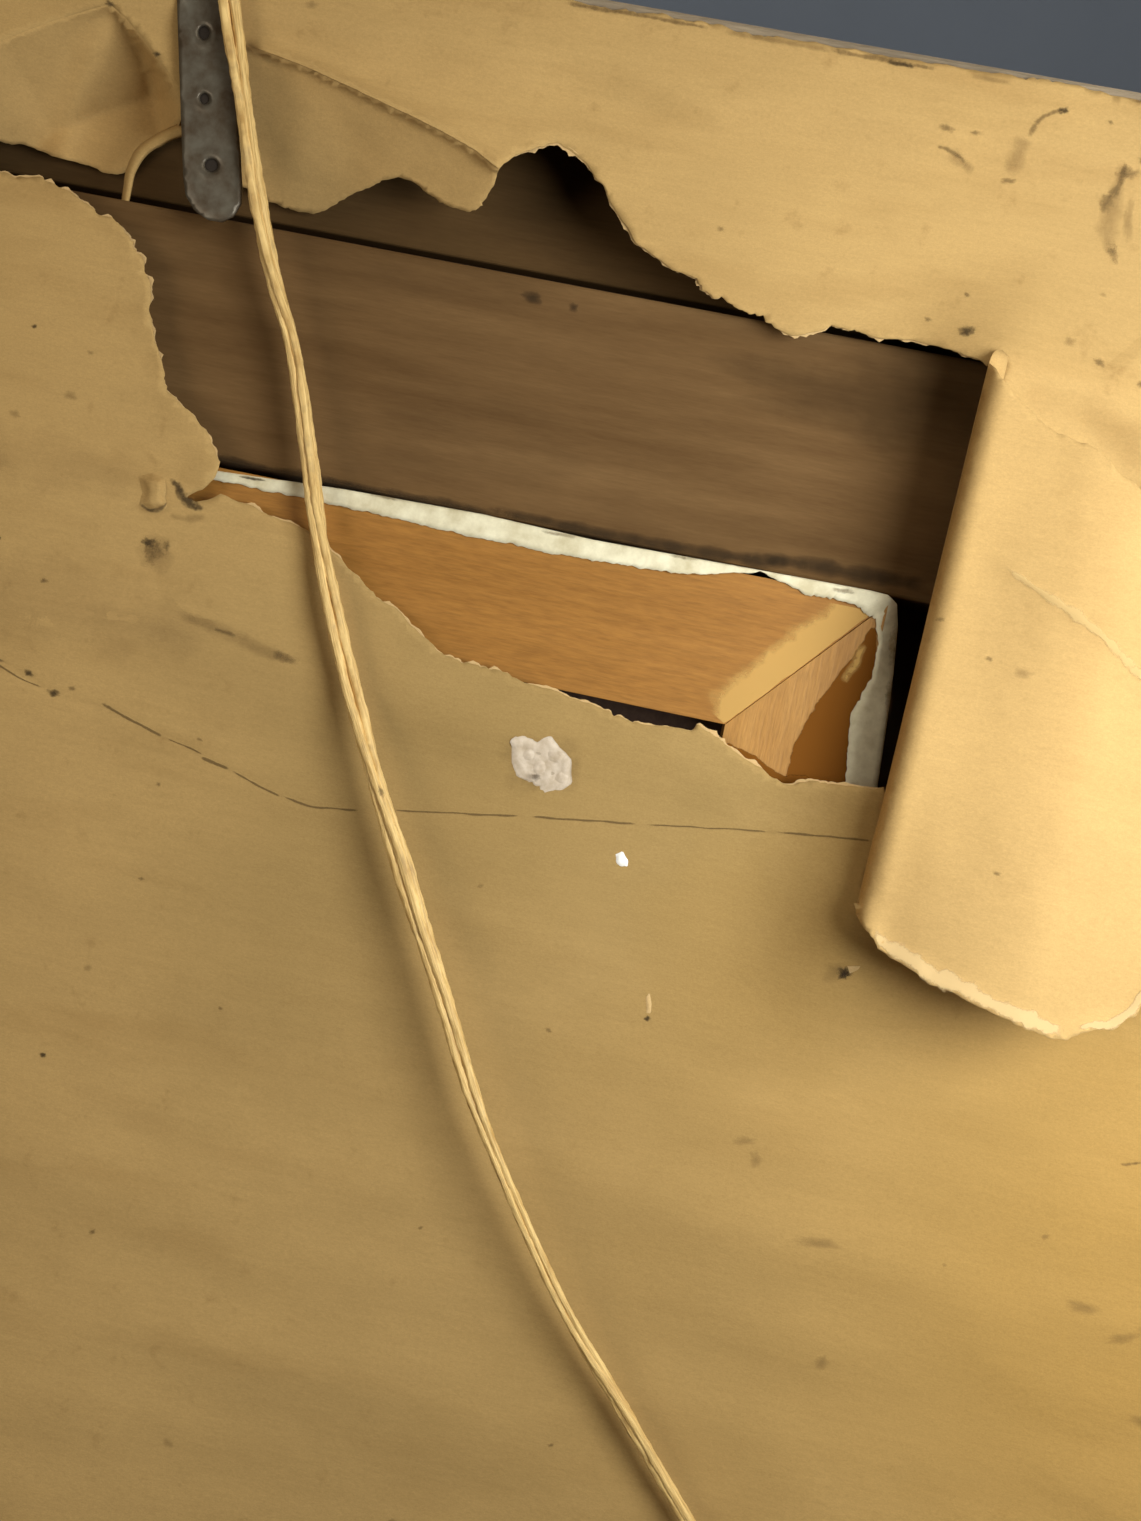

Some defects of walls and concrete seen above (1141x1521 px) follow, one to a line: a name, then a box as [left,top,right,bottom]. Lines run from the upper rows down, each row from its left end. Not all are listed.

peeling [510,737,524,748]